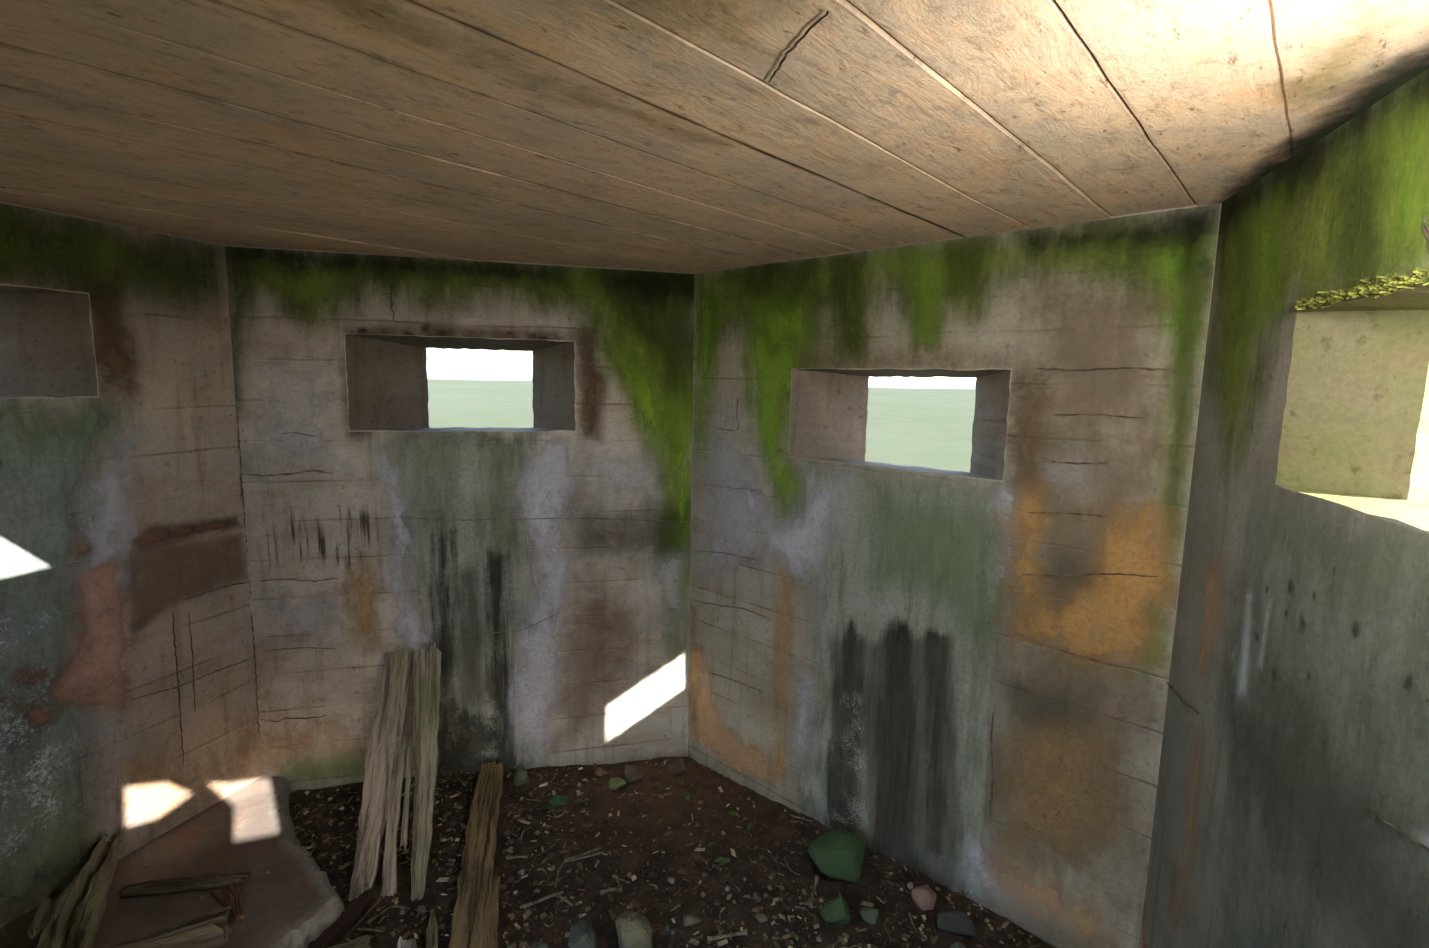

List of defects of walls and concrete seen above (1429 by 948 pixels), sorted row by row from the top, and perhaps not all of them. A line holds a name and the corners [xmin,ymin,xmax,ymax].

crack [768,11,829,83]
damp [1221,141,1331,310]
damp [380,432,623,775]
damp [581,256,1143,900]